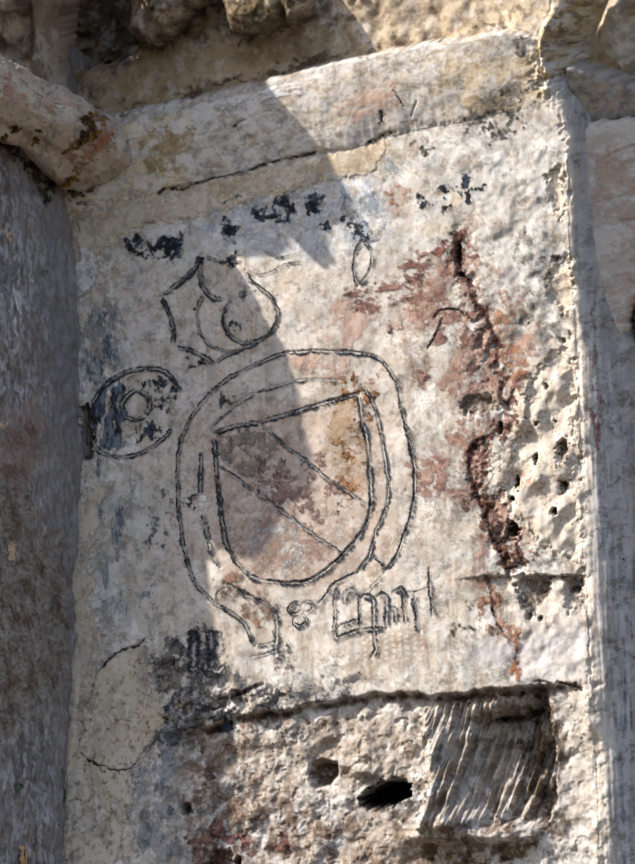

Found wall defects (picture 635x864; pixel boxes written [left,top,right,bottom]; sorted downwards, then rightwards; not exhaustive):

crack [157,152,315,204]
crack [427,234,524,631]
crack [91,638,146,694]
crack [537,680,582,691]
crack [79,733,160,772]